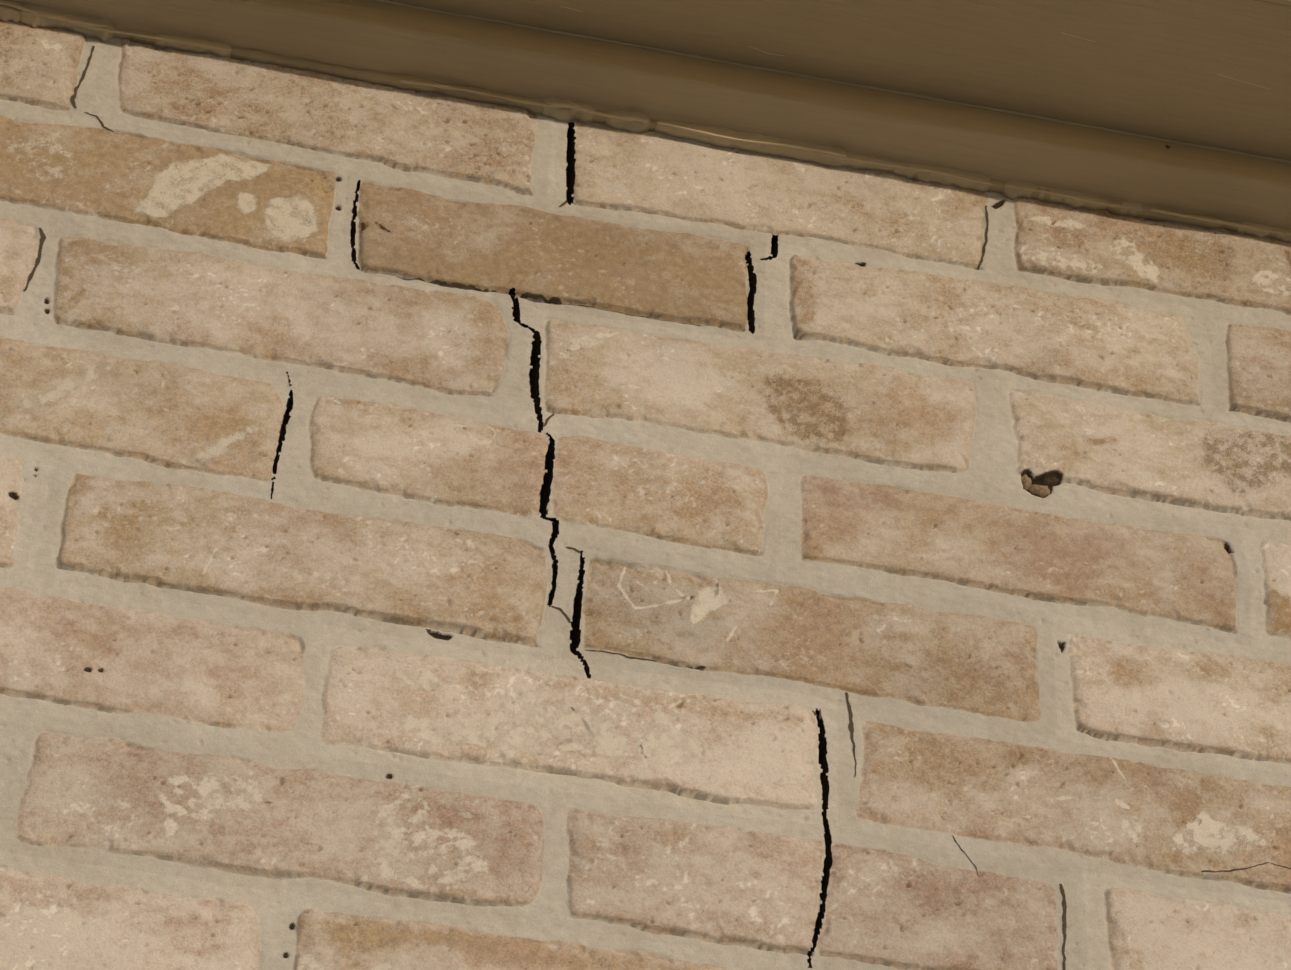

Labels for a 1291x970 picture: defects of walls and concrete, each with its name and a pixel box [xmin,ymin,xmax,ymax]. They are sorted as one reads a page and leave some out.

crack [559,129,576,207]
crack [746,239,778,334]
crack [270,373,293,499]
crack [396,276,705,679]
crack [807,692,857,968]